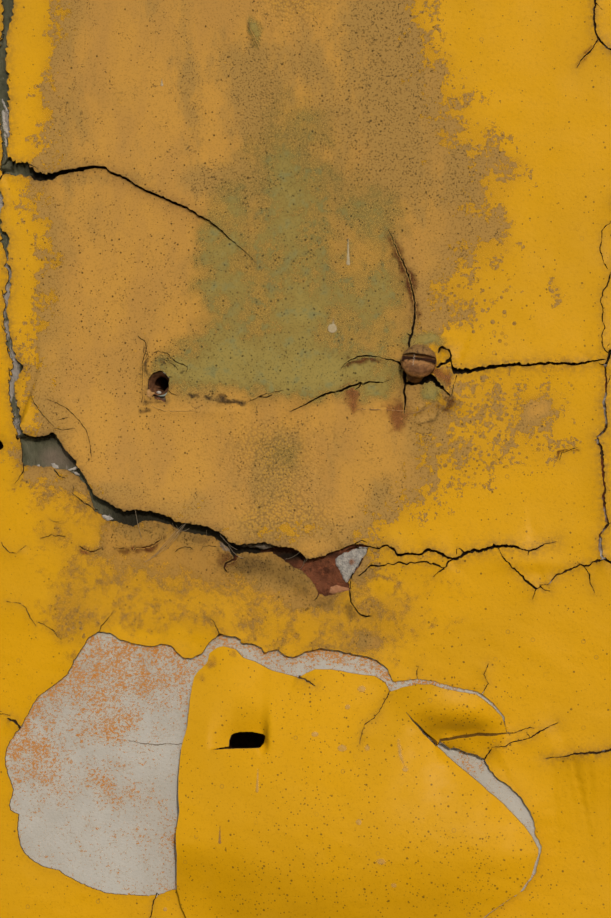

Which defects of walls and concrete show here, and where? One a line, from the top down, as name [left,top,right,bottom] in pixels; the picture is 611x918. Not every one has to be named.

crack [577,0,611,67]
crack [0,0,257,440]
crack [251,224,611,617]
crack [43,521,238,572]
peeling [5,632,510,897]
peeling [409,715,542,918]
crack [483,723,557,759]
crack [549,748,611,758]